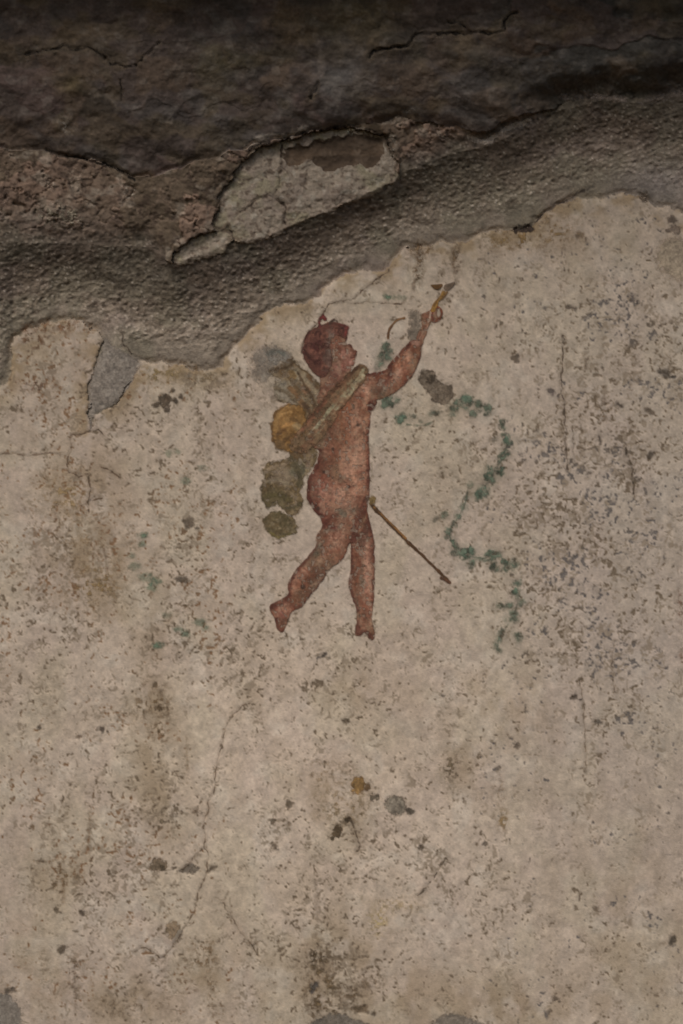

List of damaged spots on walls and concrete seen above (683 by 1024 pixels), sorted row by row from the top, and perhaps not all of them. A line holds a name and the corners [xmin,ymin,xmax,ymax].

crack [368,12,518,59]
crack [25,42,160,89]
spalling [512,224,534,234]
spalling [665,215,680,234]
spalling [408,310,422,341]
spalling [251,346,284,382]
spalling [153,389,182,412]
spalling [418,370,454,405]
crack [135,703,250,958]